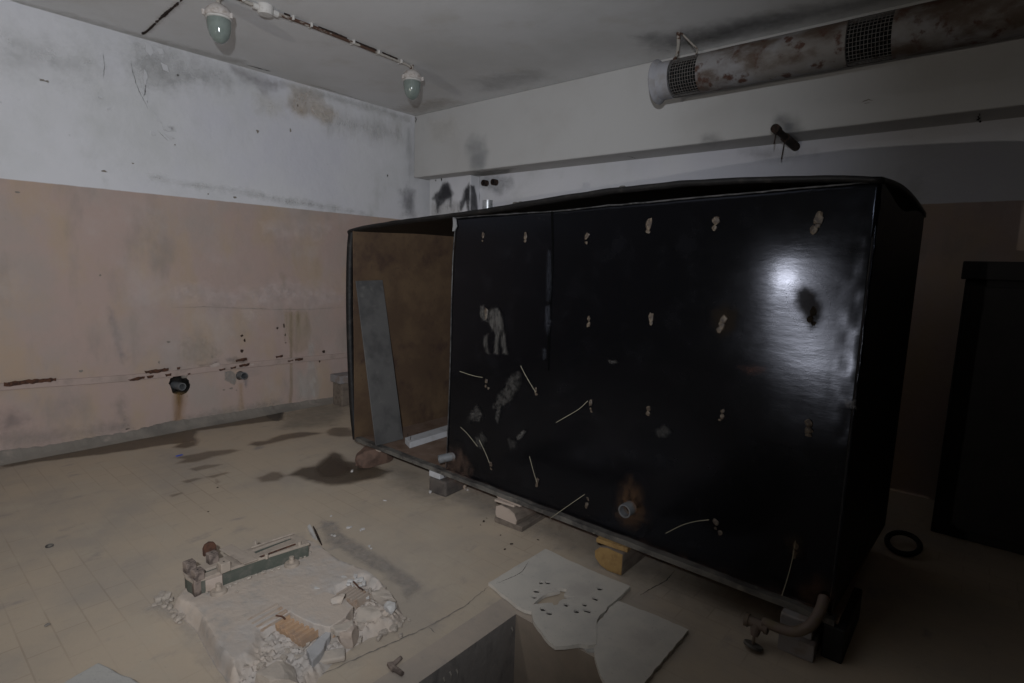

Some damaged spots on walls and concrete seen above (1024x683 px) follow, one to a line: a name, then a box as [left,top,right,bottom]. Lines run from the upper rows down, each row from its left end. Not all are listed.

corrosion [318,26,398,60]
water stain [434,183,469,211]
corrosion [4,378,56,387]
corrosion [130,367,190,381]